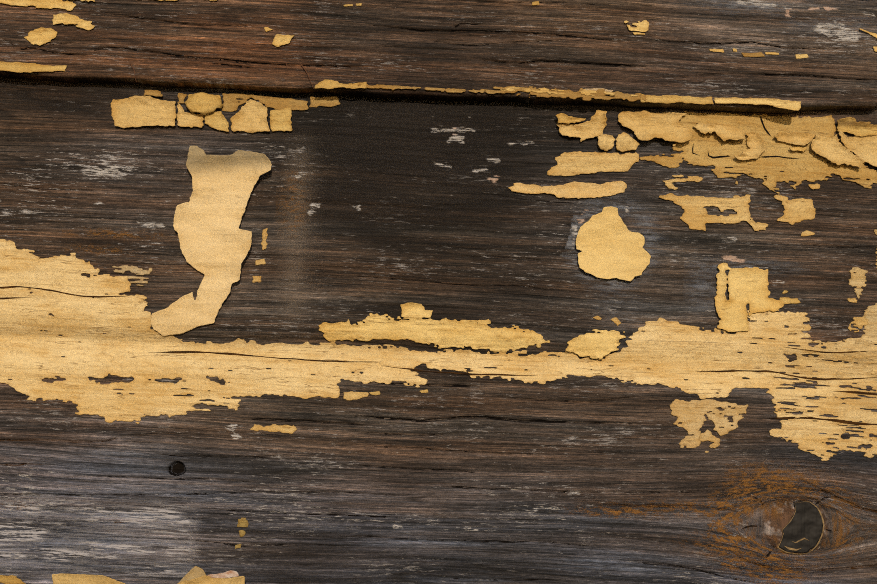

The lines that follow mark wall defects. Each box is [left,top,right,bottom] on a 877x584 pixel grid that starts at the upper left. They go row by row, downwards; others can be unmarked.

peeling [0,0,95,46]
peeling [110,79,877,281]
peeling [0,146,877,461]
peeling [0,575,26,584]